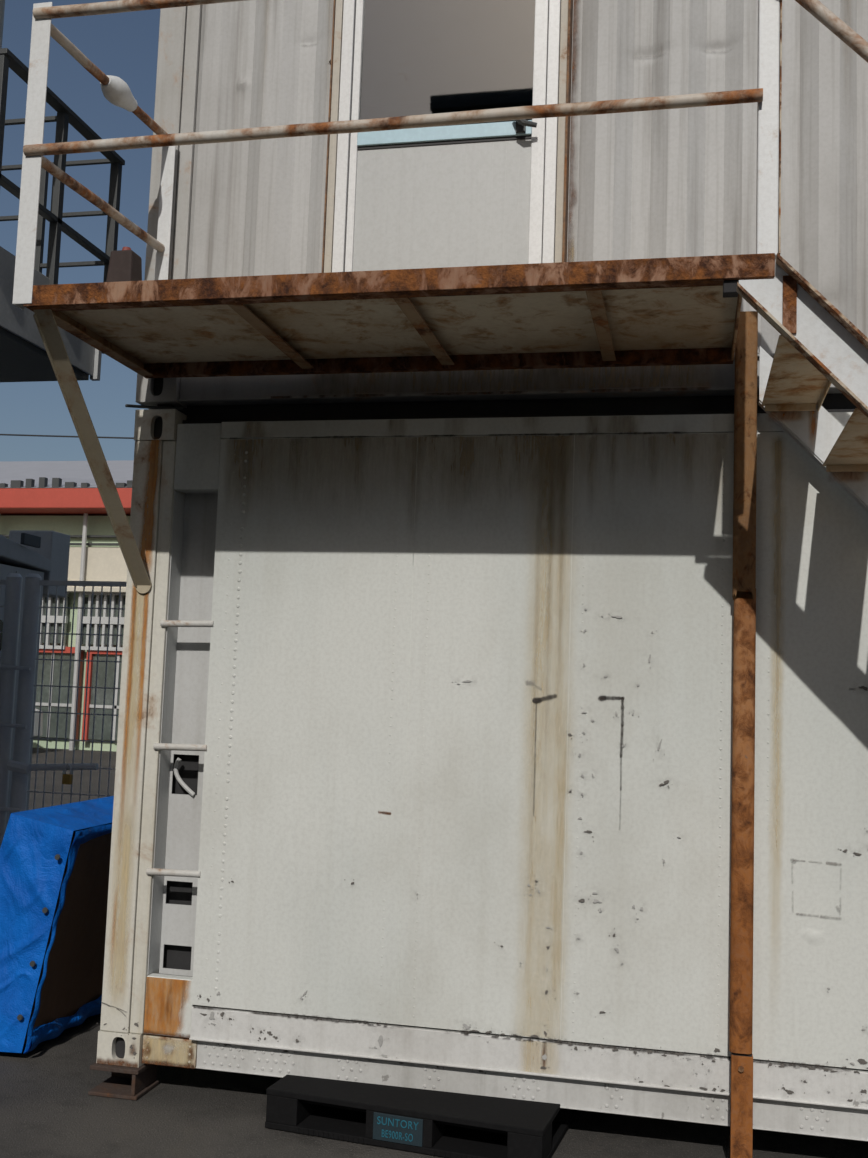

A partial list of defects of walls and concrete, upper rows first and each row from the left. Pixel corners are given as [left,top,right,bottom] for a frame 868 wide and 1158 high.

corrosion [141,439,159,565]
corrosion [123,586,148,781]
corrosion [97,977,194,1069]
peeling [462,1024,725,1099]
peeling [768,1059,868,1094]